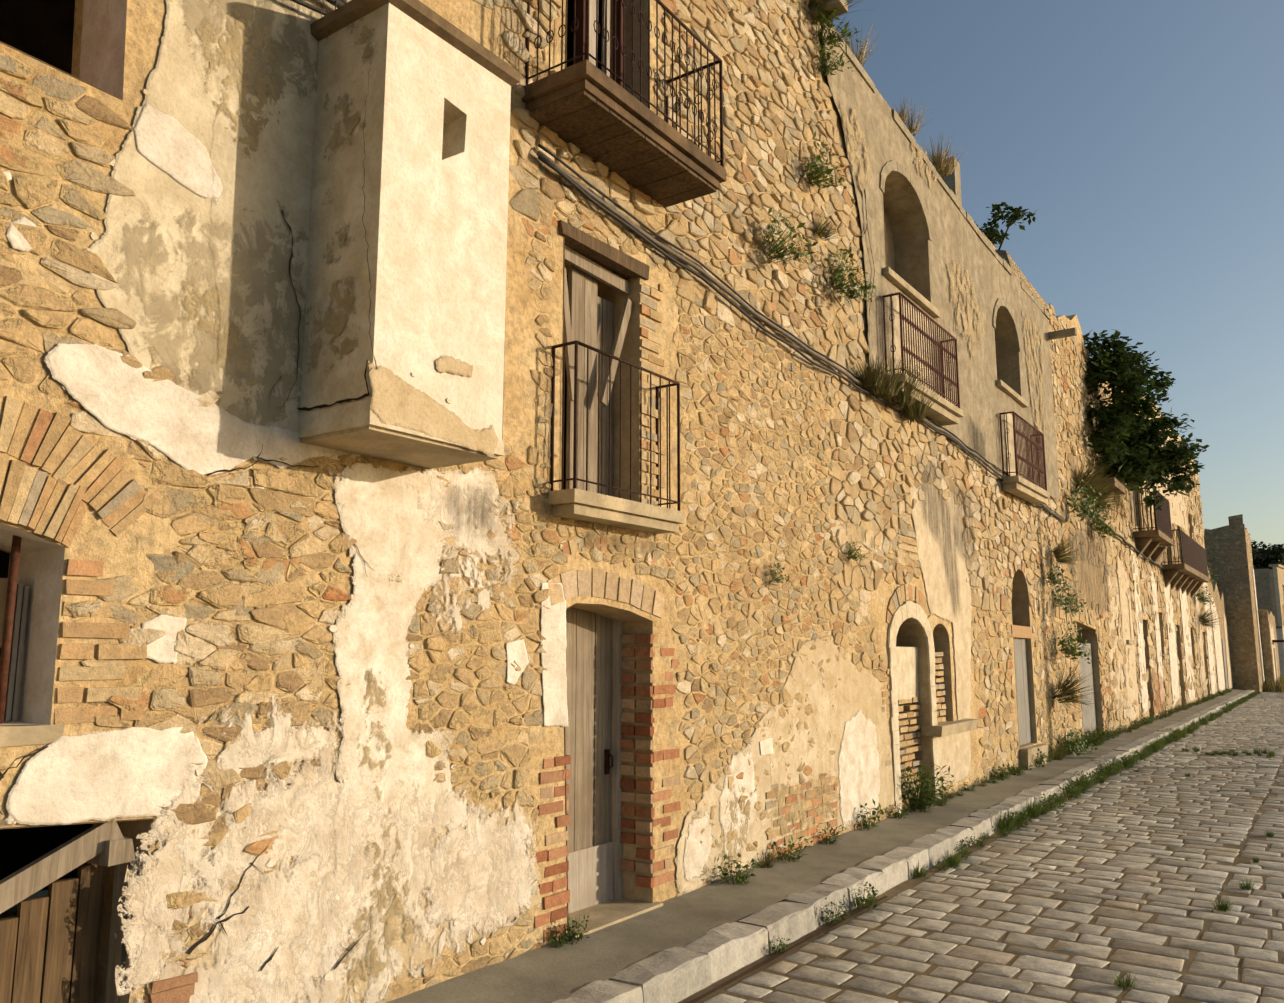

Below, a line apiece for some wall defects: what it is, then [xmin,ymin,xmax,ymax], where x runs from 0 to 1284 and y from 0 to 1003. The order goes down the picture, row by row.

crack [269,62,377,411]
crack [206,446,319,476]
peeling [3,0,541,1003]
peeling [541,582,569,727]
crack [188,848,267,955]